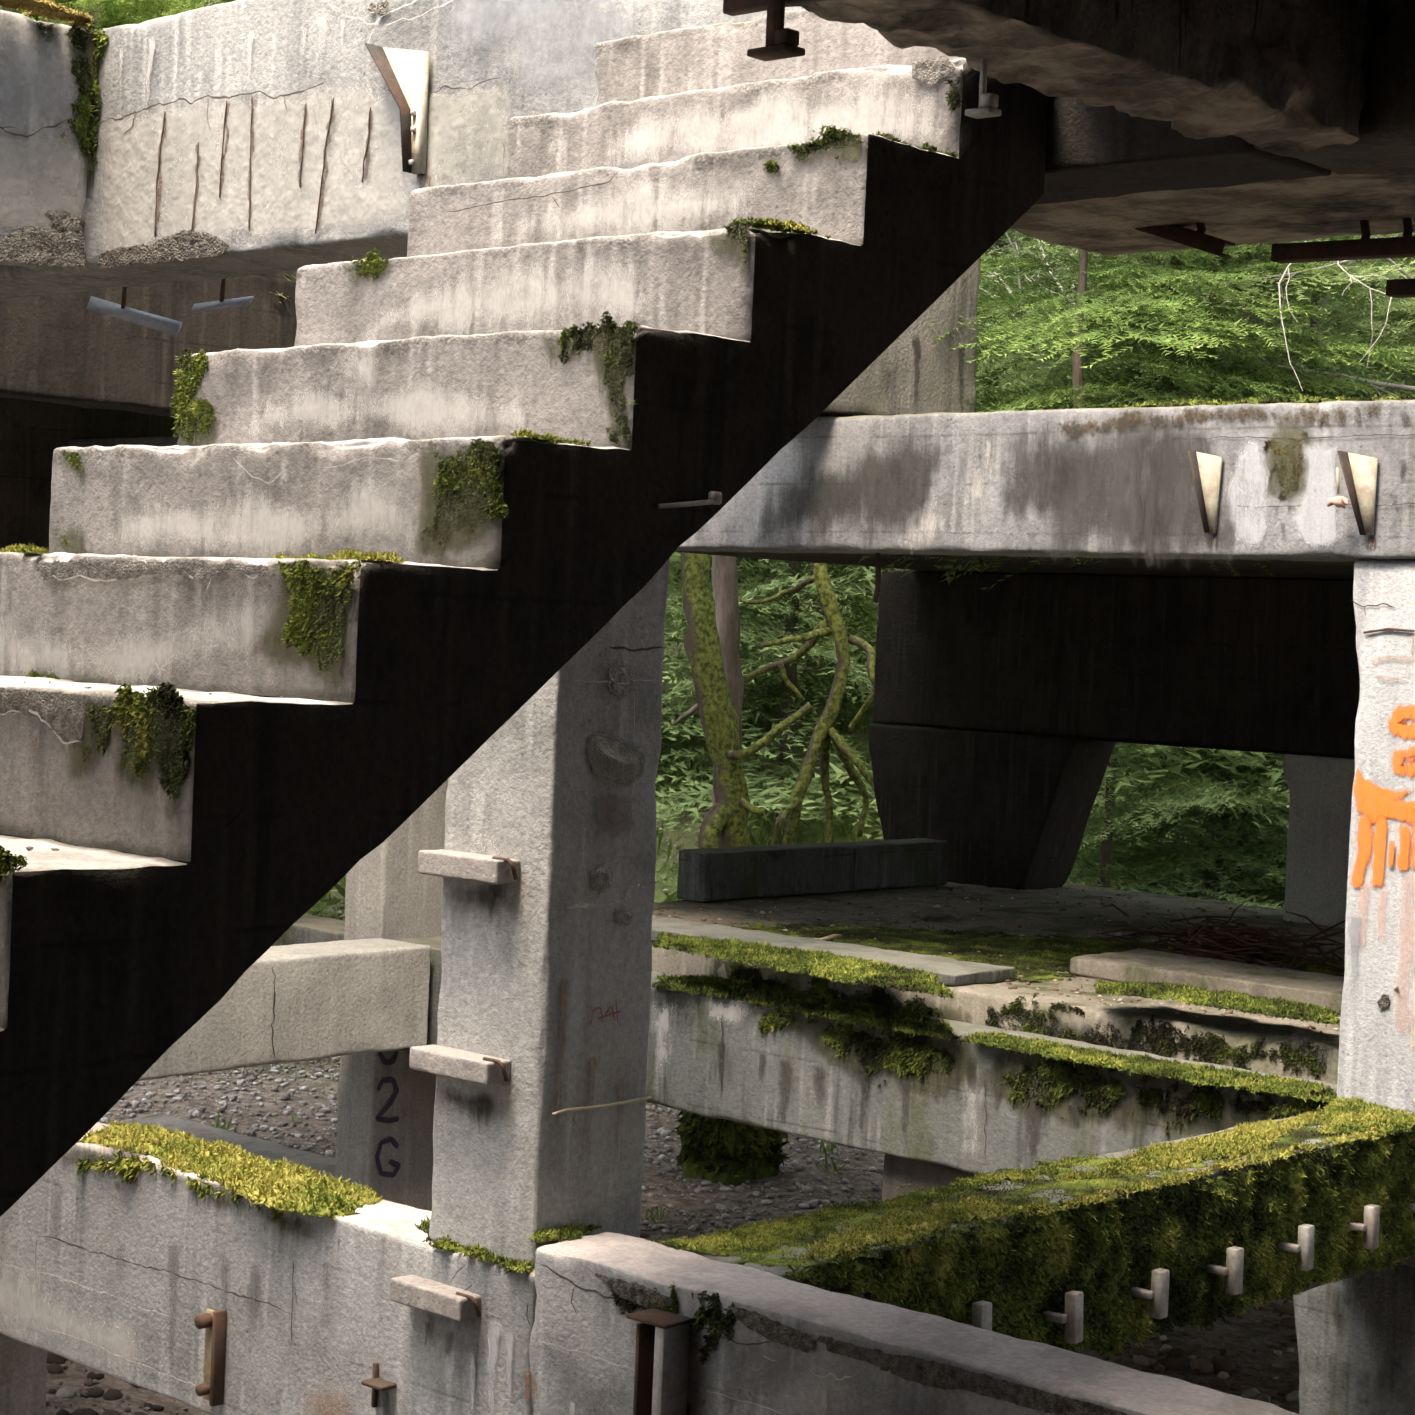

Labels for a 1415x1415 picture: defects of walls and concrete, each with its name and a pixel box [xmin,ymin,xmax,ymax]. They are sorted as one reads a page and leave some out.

crack [0,81,327,137]
crack [431,77,502,93]
peeling [0,91,404,271]
water stain [759,438,939,540]
water stain [1004,404,1379,557]
spalling [0,688,86,744]
crack [269,969,277,1055]
crack [5,1236,298,1341]
spalling [595,1274,674,1309]
crack [44,1327,196,1386]
spalling [728,1306,1127,1415]